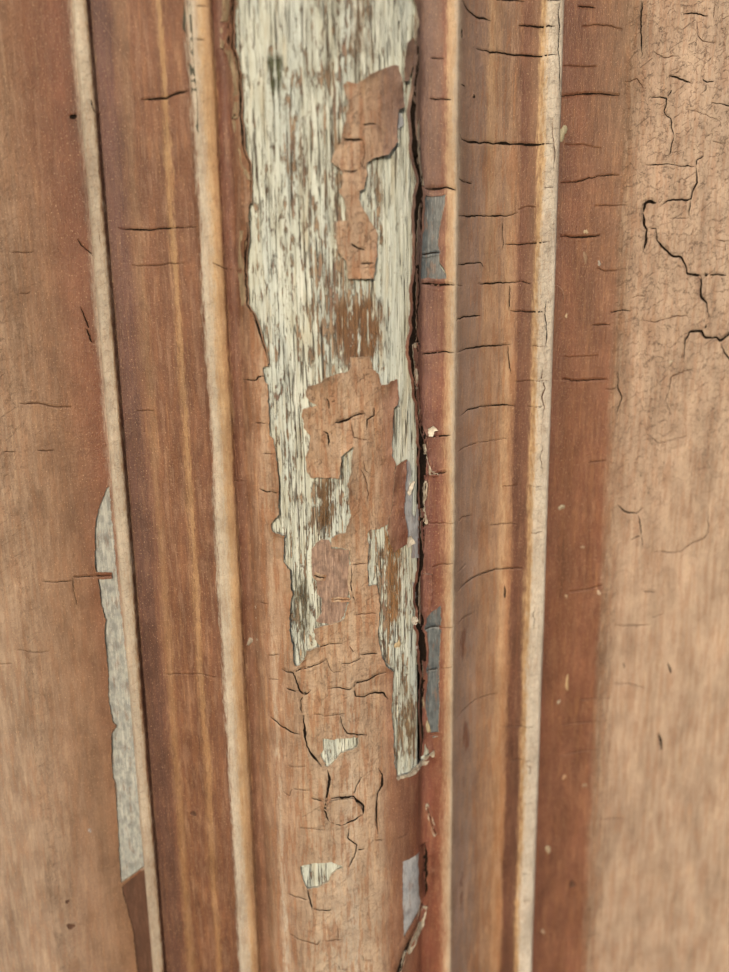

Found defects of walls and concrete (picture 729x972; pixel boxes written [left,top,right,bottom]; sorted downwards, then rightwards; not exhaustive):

crack [68,100,100,124]
crack [2,447,54,455]
crack [19,399,71,410]
peeling [220,0,446,780]
crack [405,0,729,758]
crack [313,561,376,617]
peeling [95,487,153,972]
crack [268,640,439,972]
peeling [399,853,427,972]